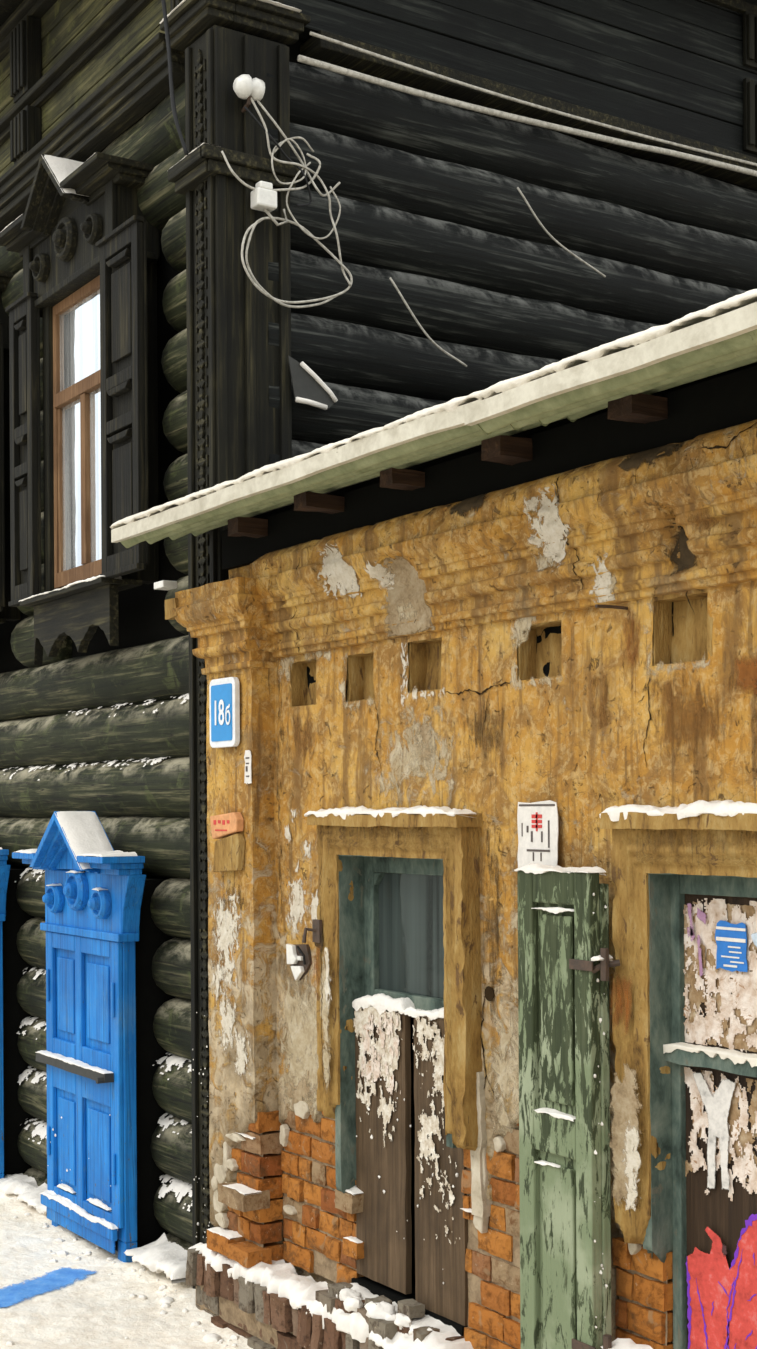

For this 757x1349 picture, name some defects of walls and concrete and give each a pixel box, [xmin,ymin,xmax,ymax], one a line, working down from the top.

crack [688,422,757,472]
flaking render [523,484,570,572]
flaking render [588,553,617,603]
flaking render [317,544,459,805]
crack [636,670,651,768]
flaking render [207,810,364,1283]
flaking render [353,979,521,1349]
flaking render [609,1064,642,1211]